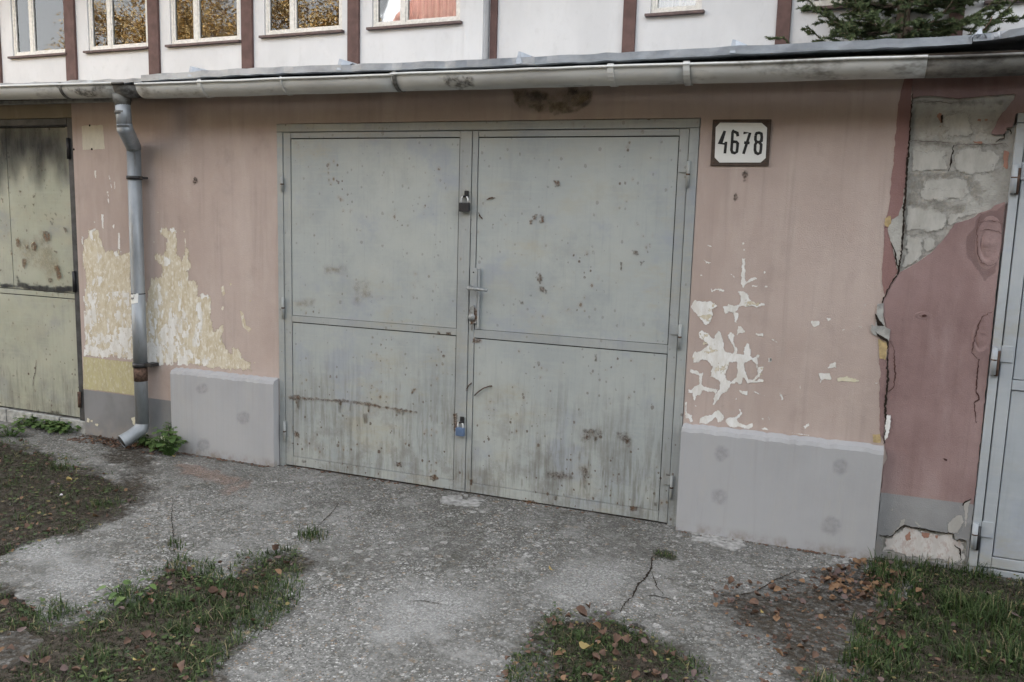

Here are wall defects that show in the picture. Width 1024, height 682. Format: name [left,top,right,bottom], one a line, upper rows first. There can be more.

crack [882,94,1012,303]
spalling [884,94,1024,273]
peeling [81,178,134,395]
peeling [146,227,256,372]
corrosion [290,395,417,422]
peeling [685,242,777,430]
peeling [819,362,859,383]
crack [883,344,897,442]
crack [620,554,671,612]
spalling [880,501,970,564]